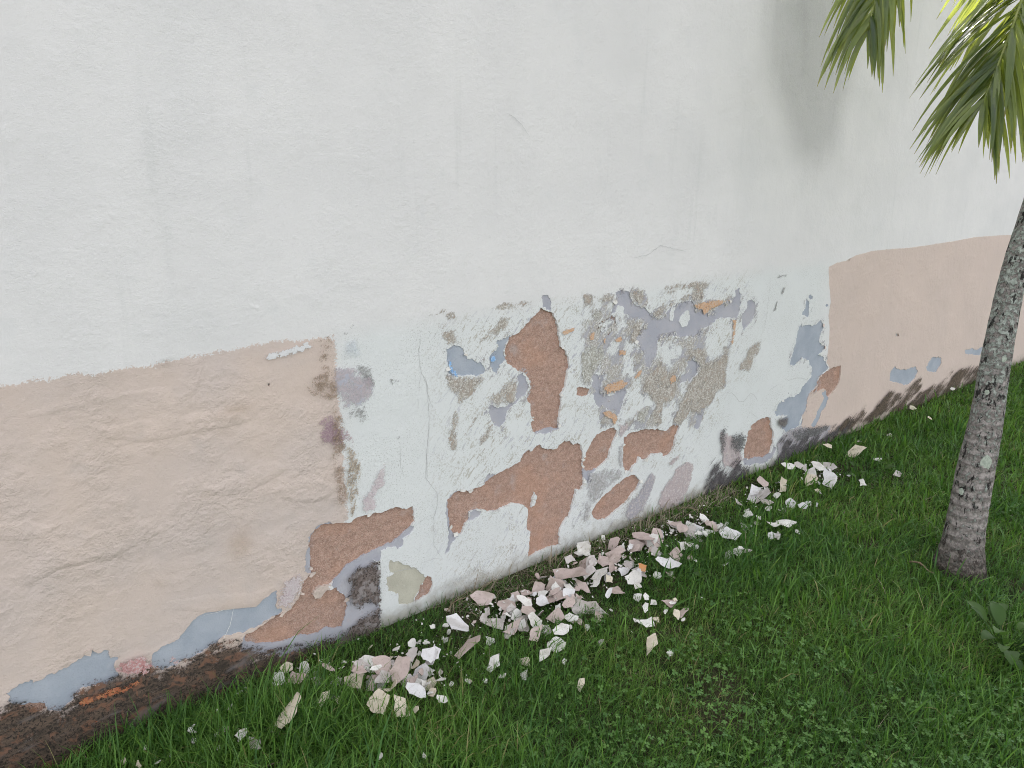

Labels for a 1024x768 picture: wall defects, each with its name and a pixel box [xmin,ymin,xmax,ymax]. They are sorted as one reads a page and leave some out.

flaking render [443,284,759,556]
peeling [743,295,840,466]
water stain [703,366,979,496]
peeling [890,357,941,385]
peeling [1,650,118,720]
water stain [0,561,382,768]
flaking render [151,507,414,669]
flaking render [415,576,432,600]